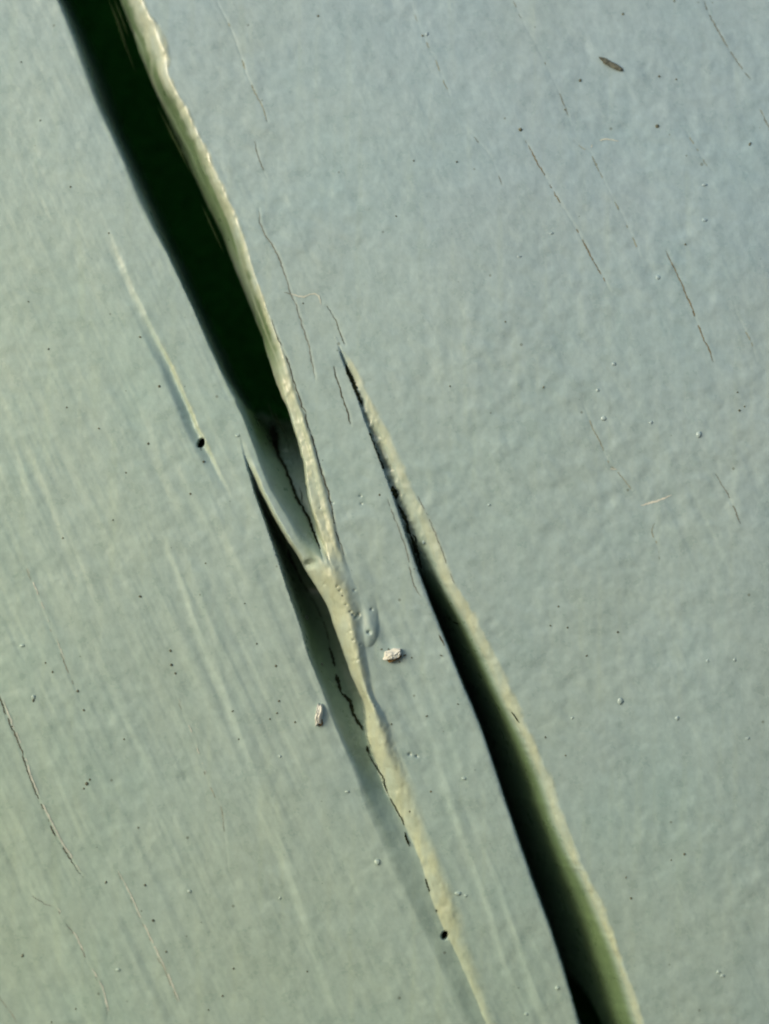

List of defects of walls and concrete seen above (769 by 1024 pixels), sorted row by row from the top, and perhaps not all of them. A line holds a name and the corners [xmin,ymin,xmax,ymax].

crack [57,0,645,1024]